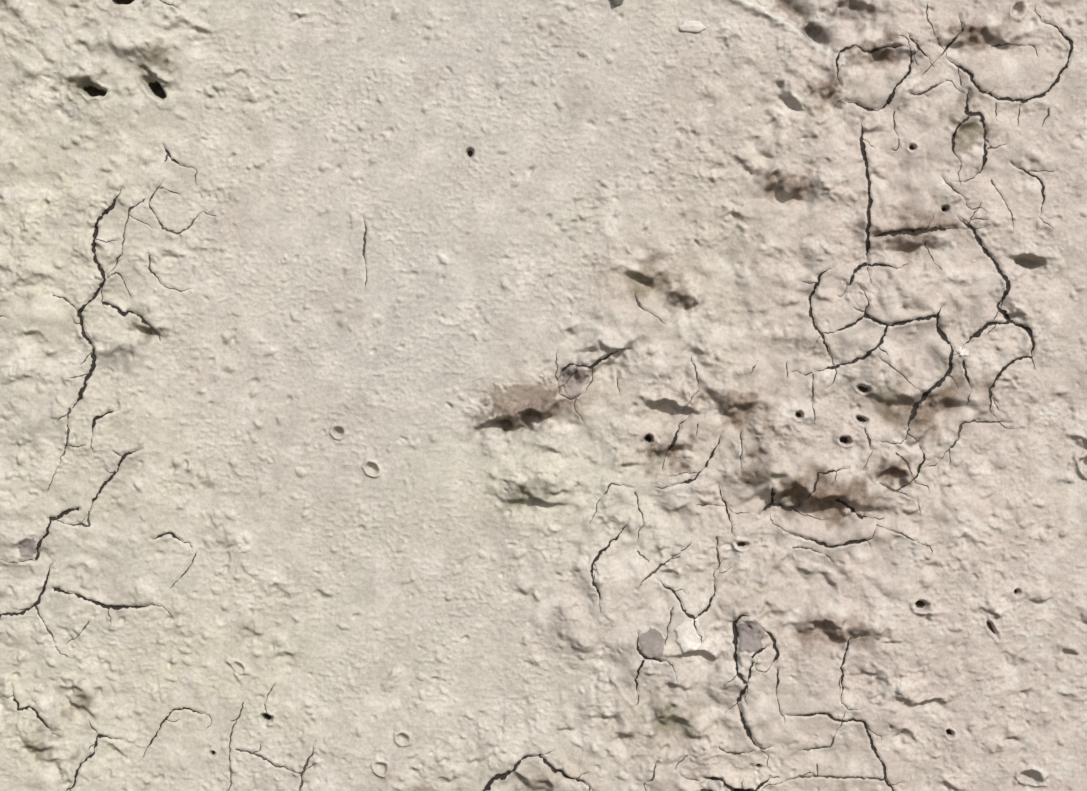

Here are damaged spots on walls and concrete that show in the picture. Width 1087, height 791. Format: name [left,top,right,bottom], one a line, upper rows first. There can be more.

crack [0,145,216,659]
spalling [486,364,601,425]
crack [555,348,632,420]
crack [589,4,1074,705]
crack [5,682,60,737]
crack [67,684,314,791]
crack [483,751,594,791]
crack [644,614,900,791]